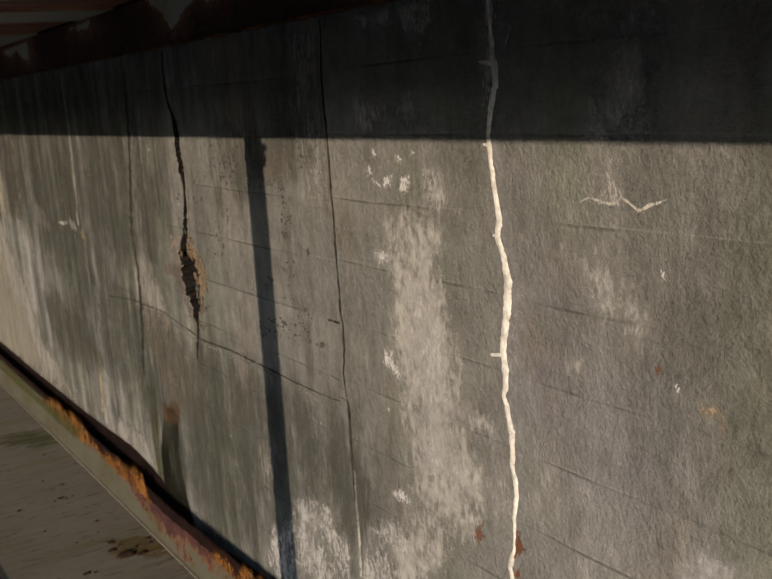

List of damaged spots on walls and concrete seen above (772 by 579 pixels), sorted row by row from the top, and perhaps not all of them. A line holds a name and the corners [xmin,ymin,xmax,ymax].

rust [0,355,261,579]
crack [112,19,363,579]
water stain [329,210,494,579]
water stain [423,167,446,213]
crack [479,0,519,579]